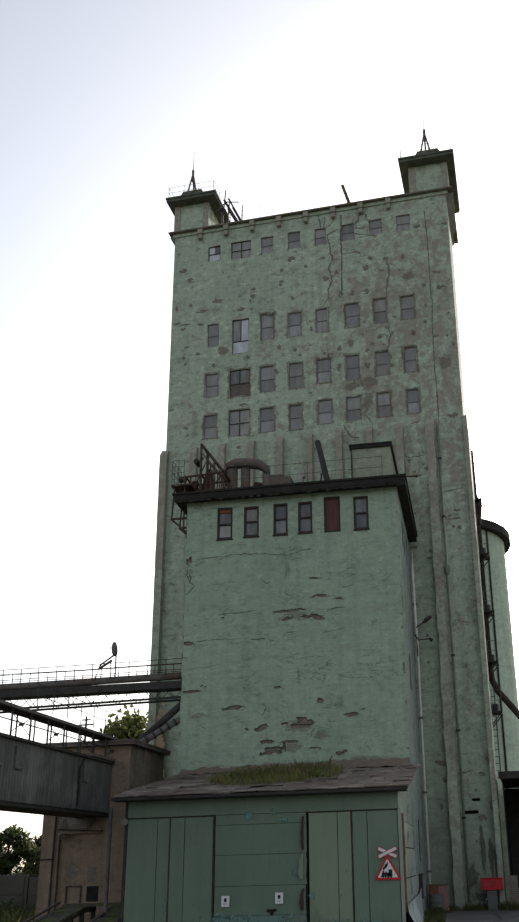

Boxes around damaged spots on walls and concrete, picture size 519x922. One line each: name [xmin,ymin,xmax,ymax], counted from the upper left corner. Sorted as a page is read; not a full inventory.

crack [318,213,376,306]
spalling [272,594,346,621]
spalling [242,717,328,756]